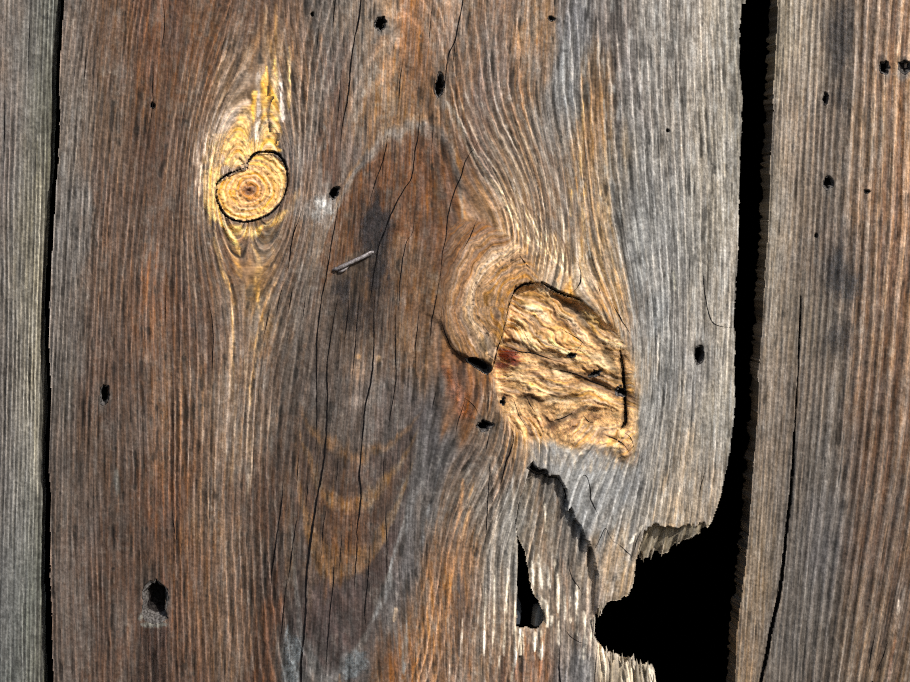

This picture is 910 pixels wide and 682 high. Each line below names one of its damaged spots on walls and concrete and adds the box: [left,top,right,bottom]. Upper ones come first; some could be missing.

crack [215,151,289,222]
crack [264,116,480,682]
crack [455,256,634,543]
crack [568,475,644,589]
crack [759,293,801,682]